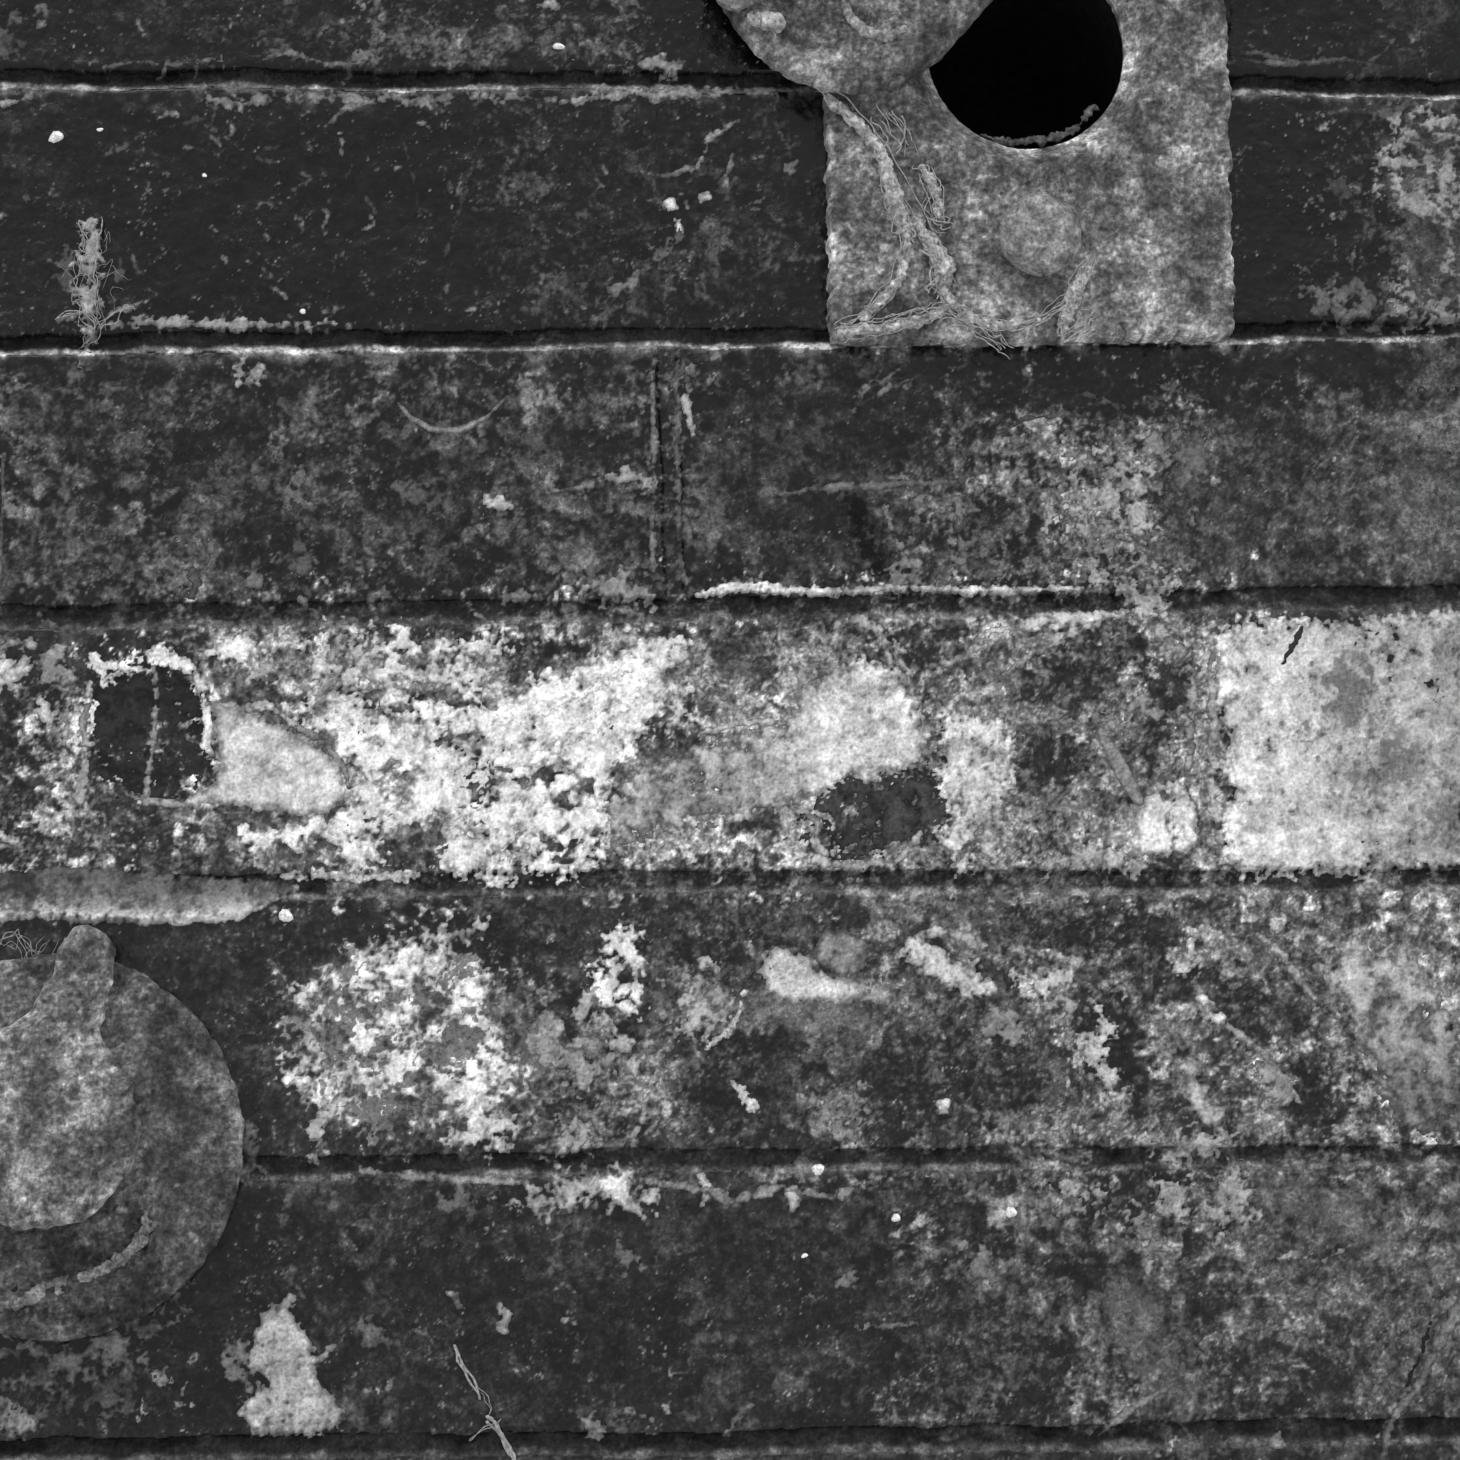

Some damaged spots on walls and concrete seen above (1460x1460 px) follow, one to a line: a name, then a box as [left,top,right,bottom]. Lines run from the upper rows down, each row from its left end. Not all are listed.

peeling [221,353,268,395]
peeling [0,431,1025,896]
peeling [758,383,1460,888]
peeling [267,901,652,1166]
peeling [668,925,1263,1278]
peeling [1171,936,1302,1107]
peeling [1256,932,1460,1143]
peeling [215,1293,345,1438]
peeling [350,1306,428,1355]
peeling [496,1302,513,1335]
peeling [580,1407,654,1441]
peeling [948,1229,1007,1287]